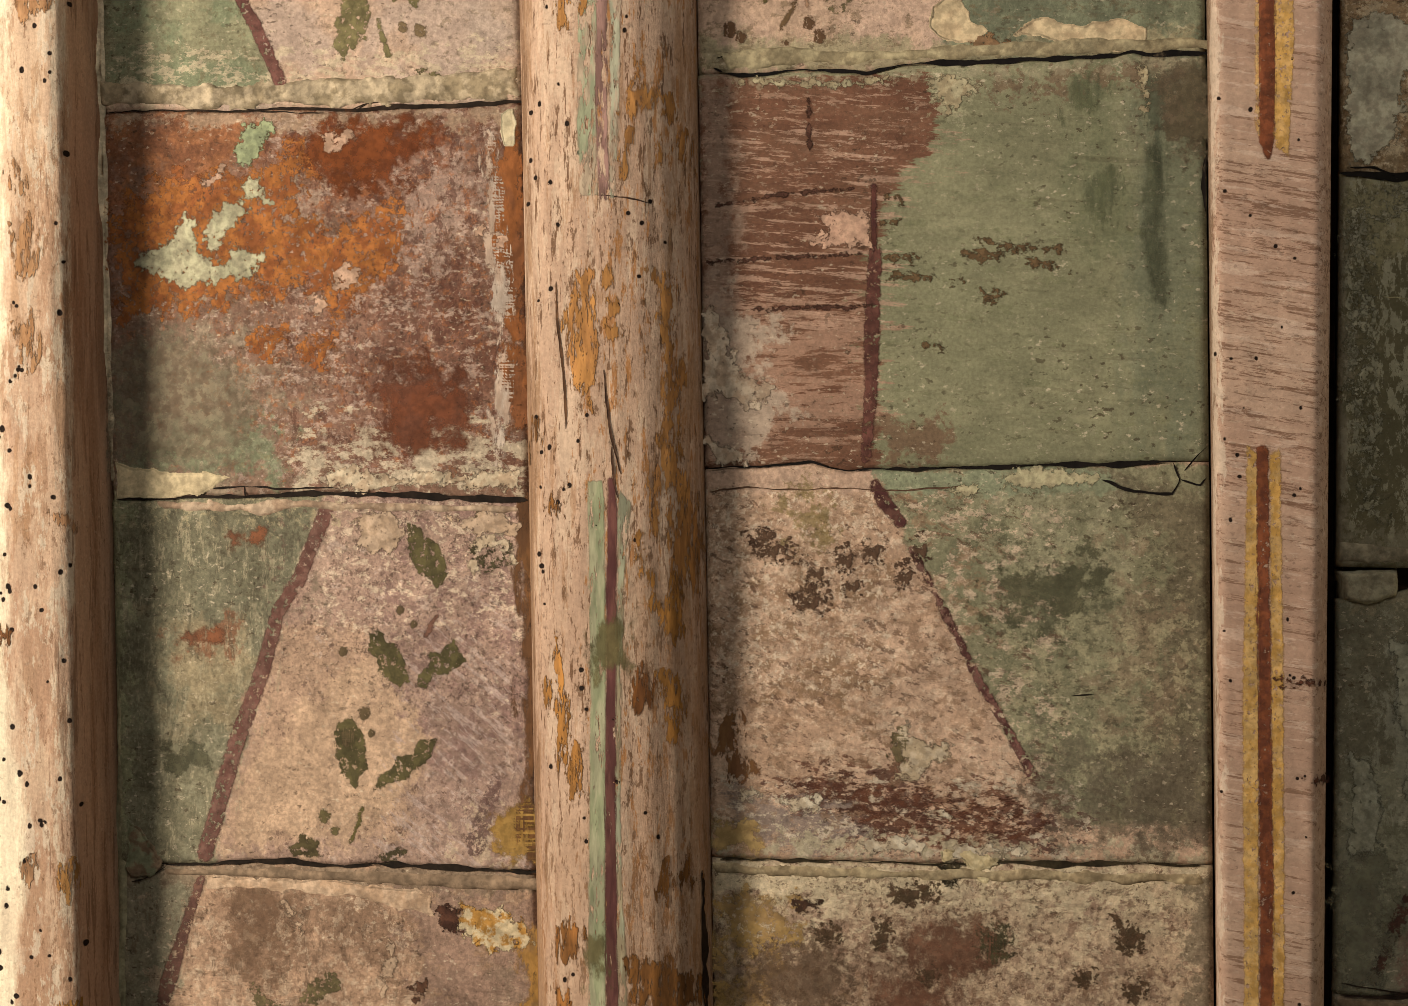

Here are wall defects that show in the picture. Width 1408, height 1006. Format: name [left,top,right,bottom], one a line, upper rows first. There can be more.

crack [109,100,522,114]
corrosion [103,103,438,373]
corrosion [486,114,528,441]
peeling [560,263,623,414]
peeling [706,187,1006,312]
corrosion [360,345,475,460]
crack [117,486,527,503]
crack [710,449,1206,496]
peeling [540,629,585,802]
crack [132,857,536,882]
peeling [555,915,588,966]
crack [701,857,1201,1006]